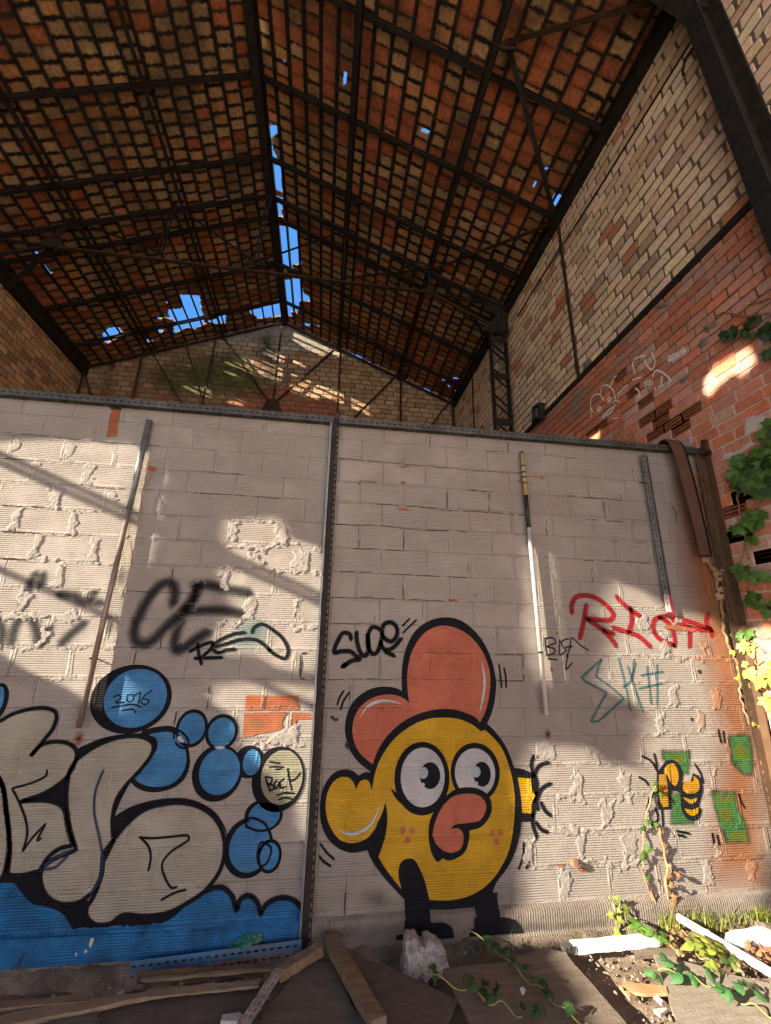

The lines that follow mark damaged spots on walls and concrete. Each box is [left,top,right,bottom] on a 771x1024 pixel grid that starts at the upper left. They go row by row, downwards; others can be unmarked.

peeling [243,695,338,771]